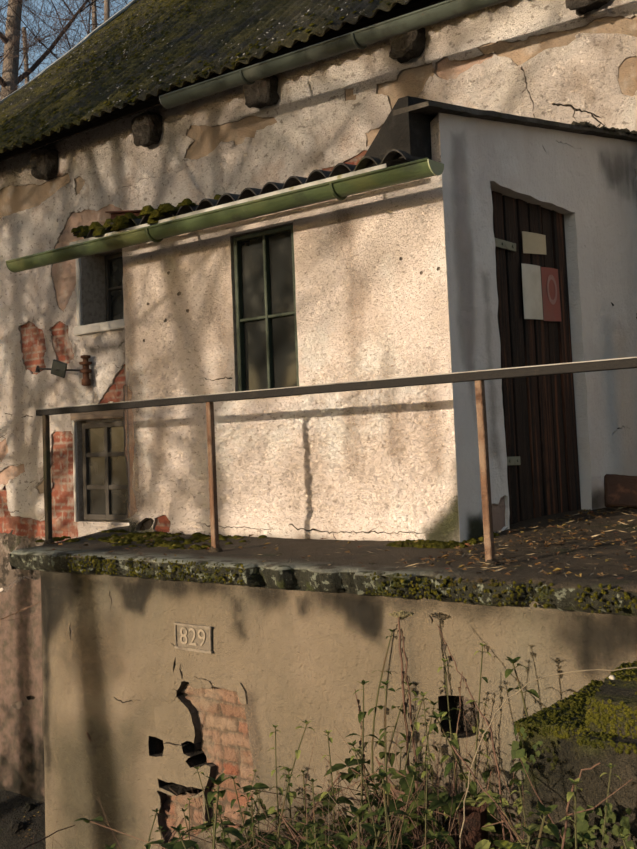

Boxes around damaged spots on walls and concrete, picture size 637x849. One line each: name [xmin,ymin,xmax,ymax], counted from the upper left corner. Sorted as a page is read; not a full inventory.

peeling [377,11,637,108]
peeling [185,116,277,160]
crack [553,103,605,125]
spalling [55,204,123,249]
spalling [20,259,76,375]
peeling [100,364,137,517]
spalling [0,429,78,592]
spalling [139,515,171,533]
water stain [121,578,217,612]
water stain [360,607,380,638]
water stain [564,614,637,672]
spalling [153,676,258,849]